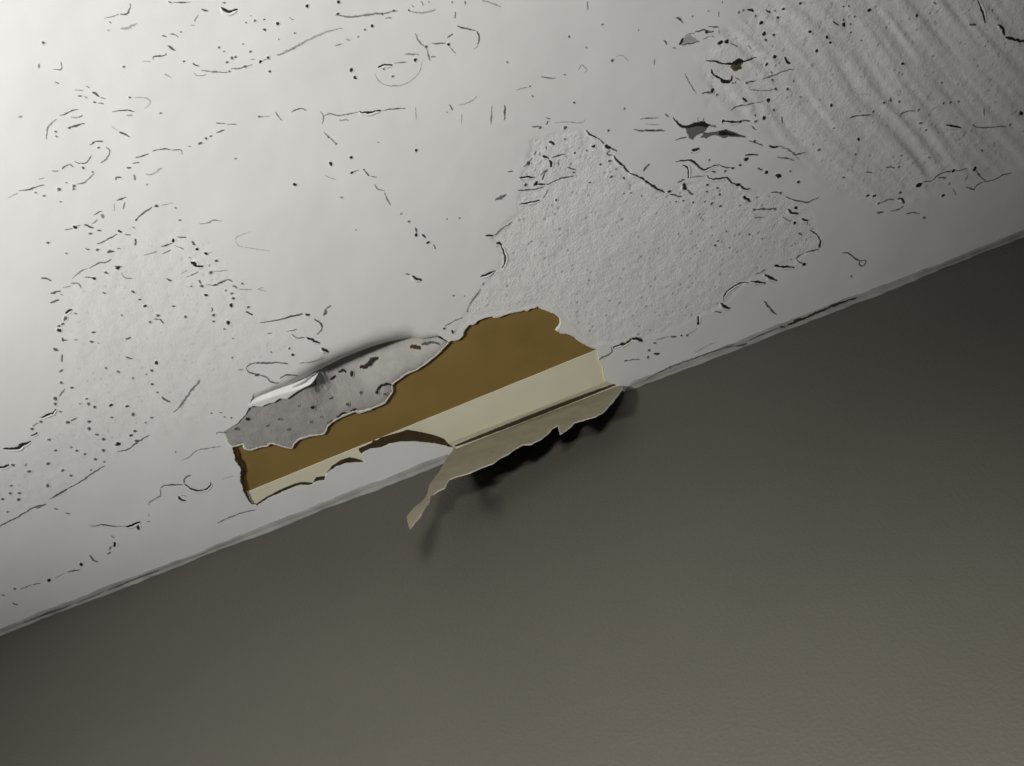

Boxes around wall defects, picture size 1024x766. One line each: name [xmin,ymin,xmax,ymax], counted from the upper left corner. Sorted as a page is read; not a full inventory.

crack [153,1,238,57]
crack [970,0,1024,46]
crack [664,1,805,161]
crack [189,108,405,147]
spalling [508,125,588,207]
spalling [665,114,778,148]
crack [135,205,219,254]
crack [584,130,867,378]
crack [189,279,331,383]
peeling [224,222,512,451]
crack [0,435,149,526]
crack [3,521,158,623]